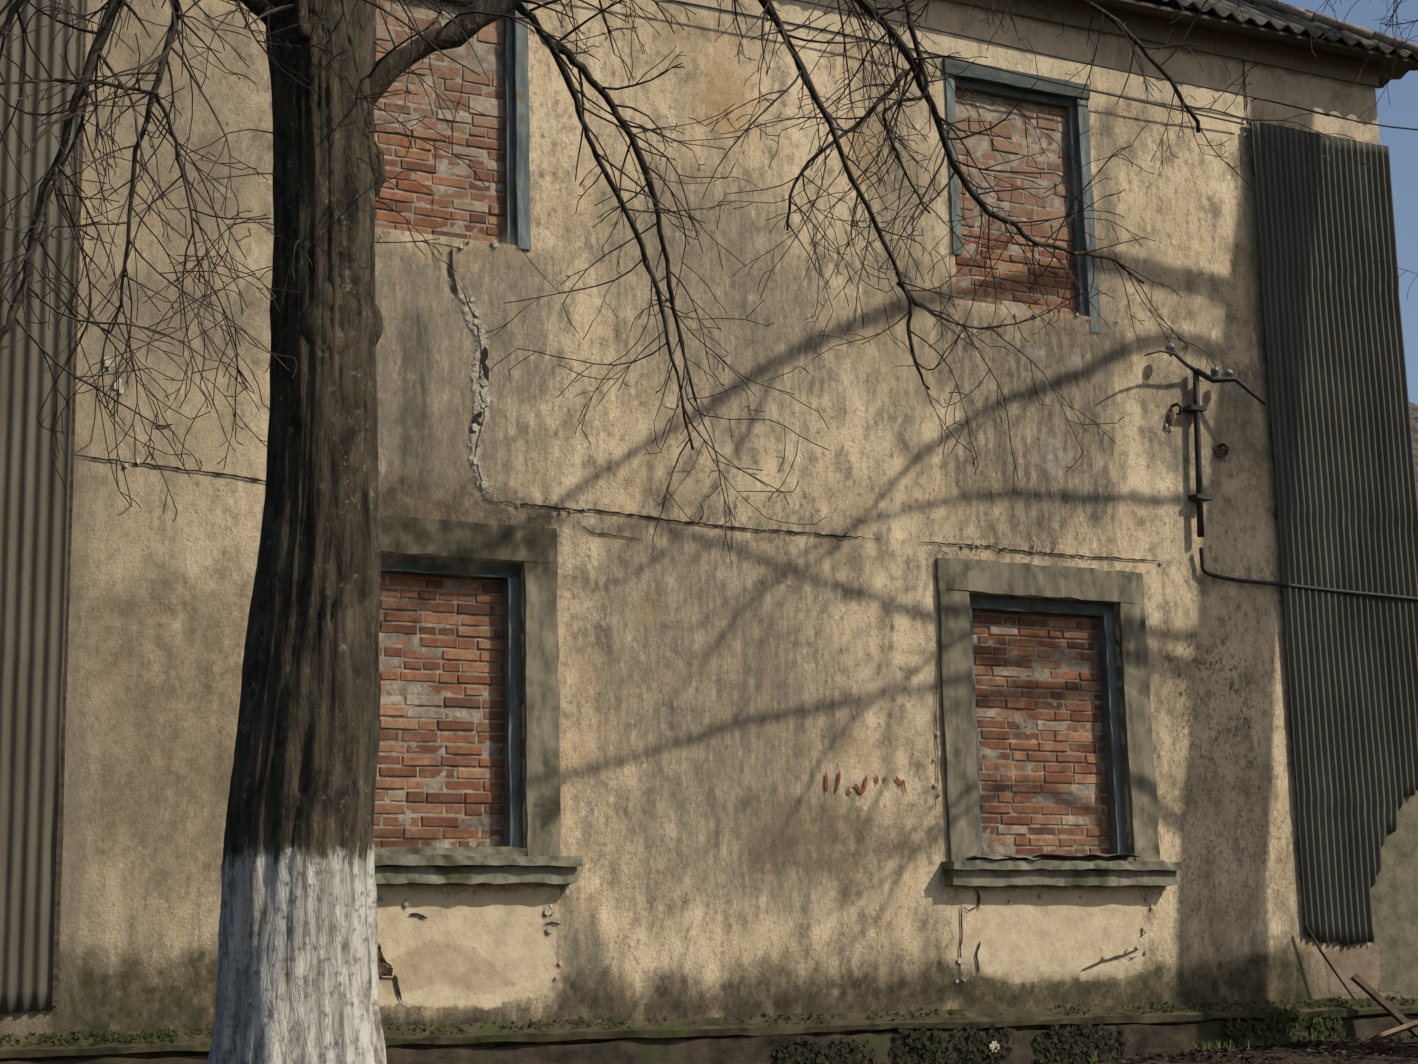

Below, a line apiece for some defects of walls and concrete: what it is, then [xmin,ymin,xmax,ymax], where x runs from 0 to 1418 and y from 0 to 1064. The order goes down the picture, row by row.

crack [449,248,458,295]
damp [938,304,1117,563]
damp [597,537,911,903]
damp [52,936,218,1034]
crack [378,942,402,1001]
damp [381,909,1309,1026]